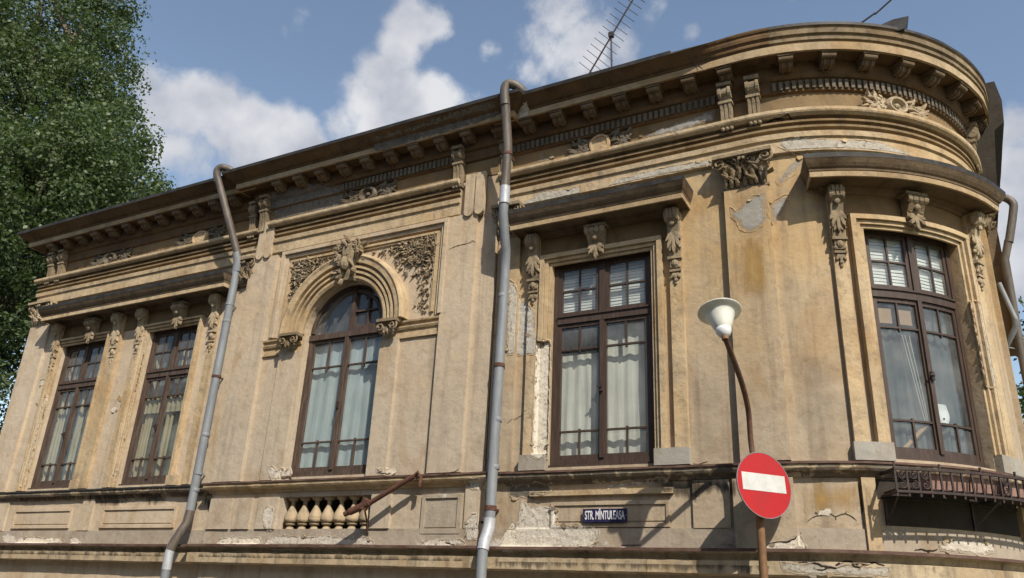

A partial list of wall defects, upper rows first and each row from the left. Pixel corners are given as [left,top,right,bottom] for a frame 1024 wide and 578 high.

flaking render [730,136,911,233]
flaking render [506,279,552,460]
flaking render [217,506,375,554]
flaking render [422,511,485,545]
flaking render [500,481,600,555]
flaking render [766,533,891,578]
flaking render [938,536,995,557]